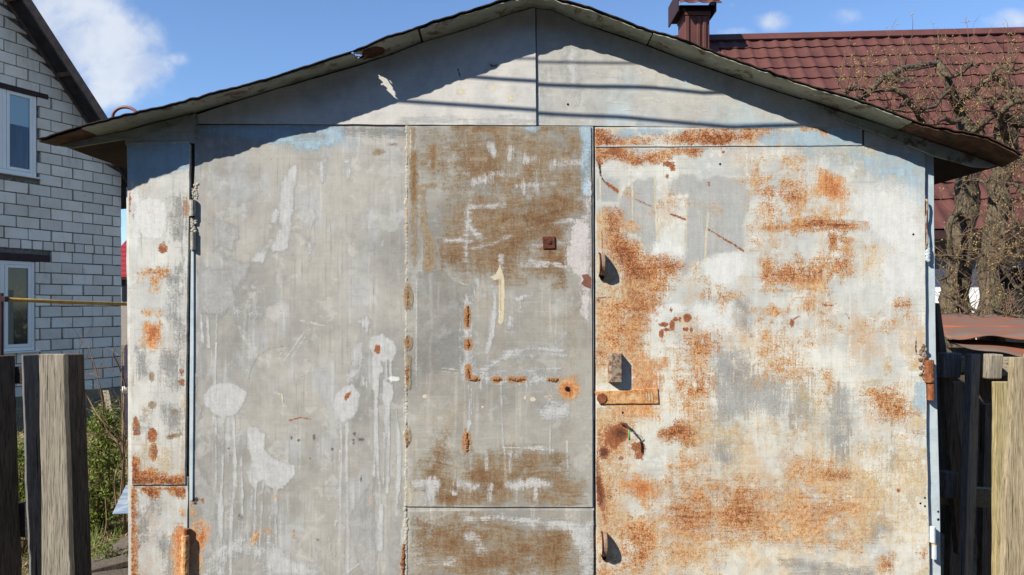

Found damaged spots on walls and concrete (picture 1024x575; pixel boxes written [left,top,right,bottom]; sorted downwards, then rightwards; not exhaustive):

corrosion [138,309,165,353]
corrosion [136,241,171,295]
corrosion [373,126,927,575]
corrosion [131,369,212,575]